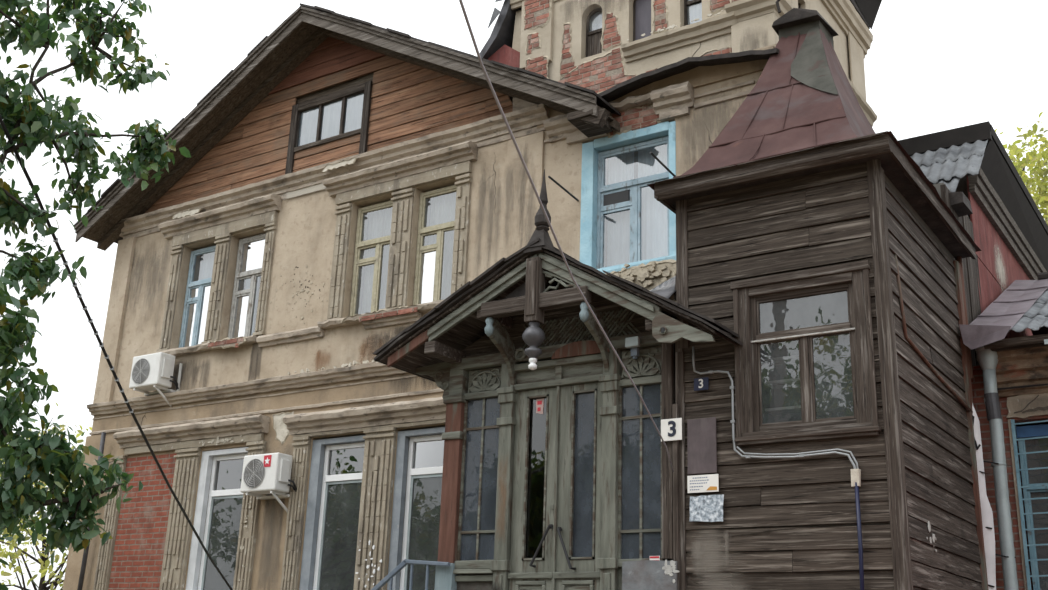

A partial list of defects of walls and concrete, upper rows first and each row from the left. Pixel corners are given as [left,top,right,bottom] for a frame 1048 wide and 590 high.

spalling [641,0,739,36]
spalling [524,0,658,93]
spalling [698,47,732,57]
spalling [608,105,660,138]